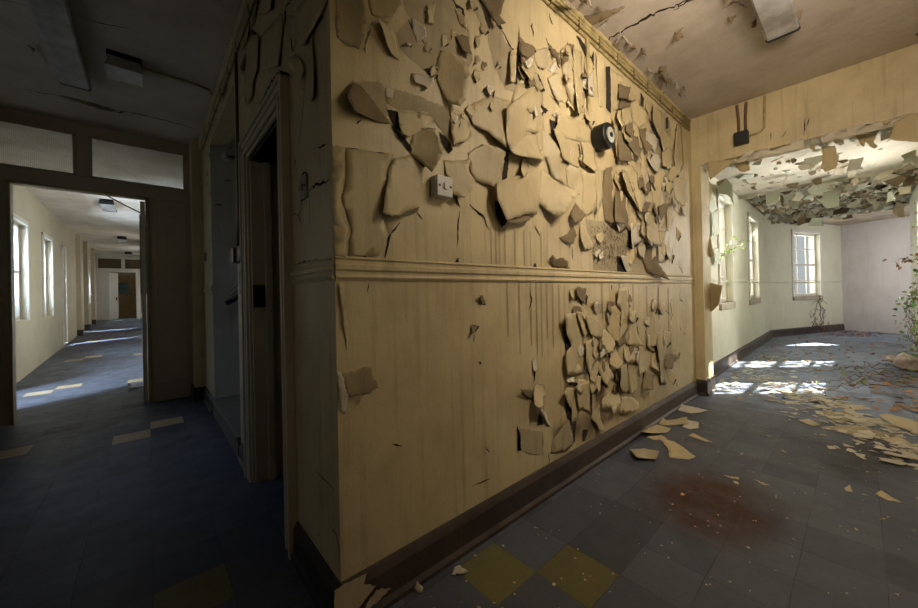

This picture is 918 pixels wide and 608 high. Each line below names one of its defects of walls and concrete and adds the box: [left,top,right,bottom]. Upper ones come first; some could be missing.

crack [608,0,692,40]
peeling [240,0,687,280]
peeling [702,112,918,265]
peeling [711,283,723,312]
peeling [517,285,685,464]